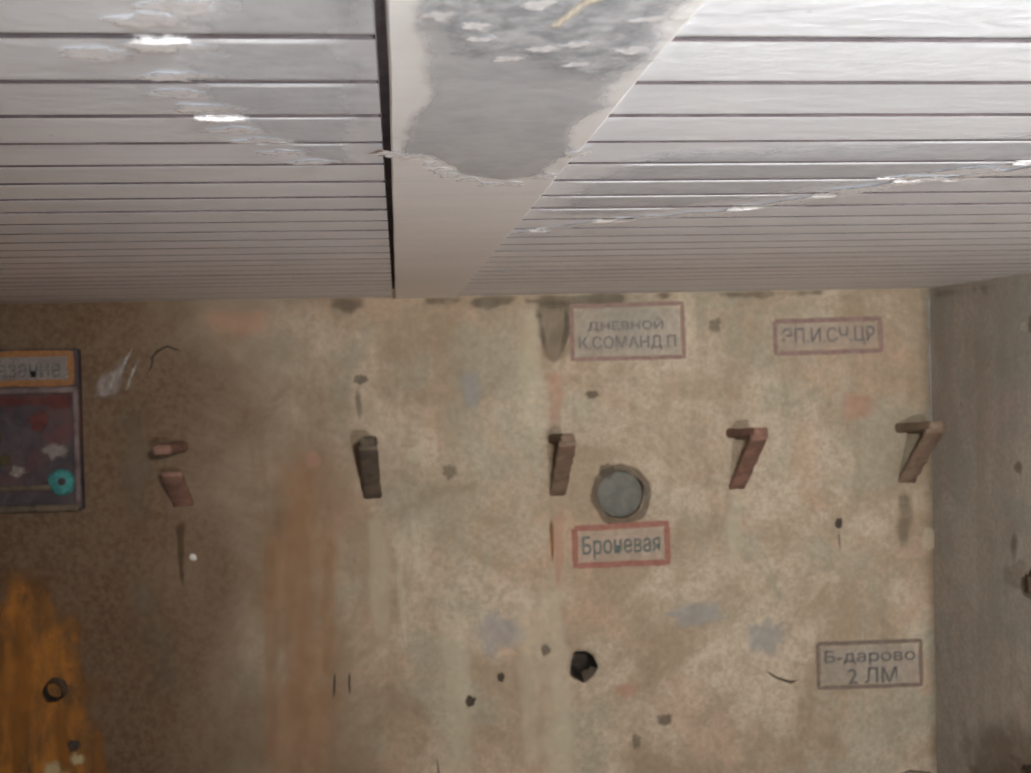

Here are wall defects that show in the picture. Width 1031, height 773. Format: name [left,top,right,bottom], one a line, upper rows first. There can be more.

peeling [374,0,682,187]
corrosion [0,580,91,773]